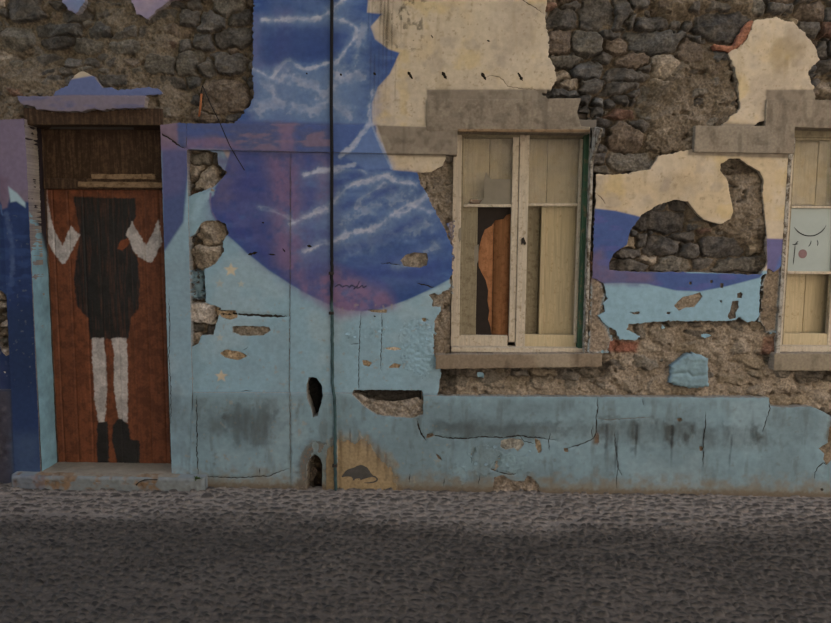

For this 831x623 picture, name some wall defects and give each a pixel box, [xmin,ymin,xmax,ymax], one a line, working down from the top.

spalling [0,0,255,125]
spalling [190,151,227,195]
spalling [417,155,461,244]
spalling [437,0,831,414]
spalling [0,290,9,356]
spalling [188,220,271,345]
spalling [401,252,428,268]
spalling [422,276,451,356]
spalling [353,390,423,418]
crack [417,399,650,485]
spalling [819,427,831,464]